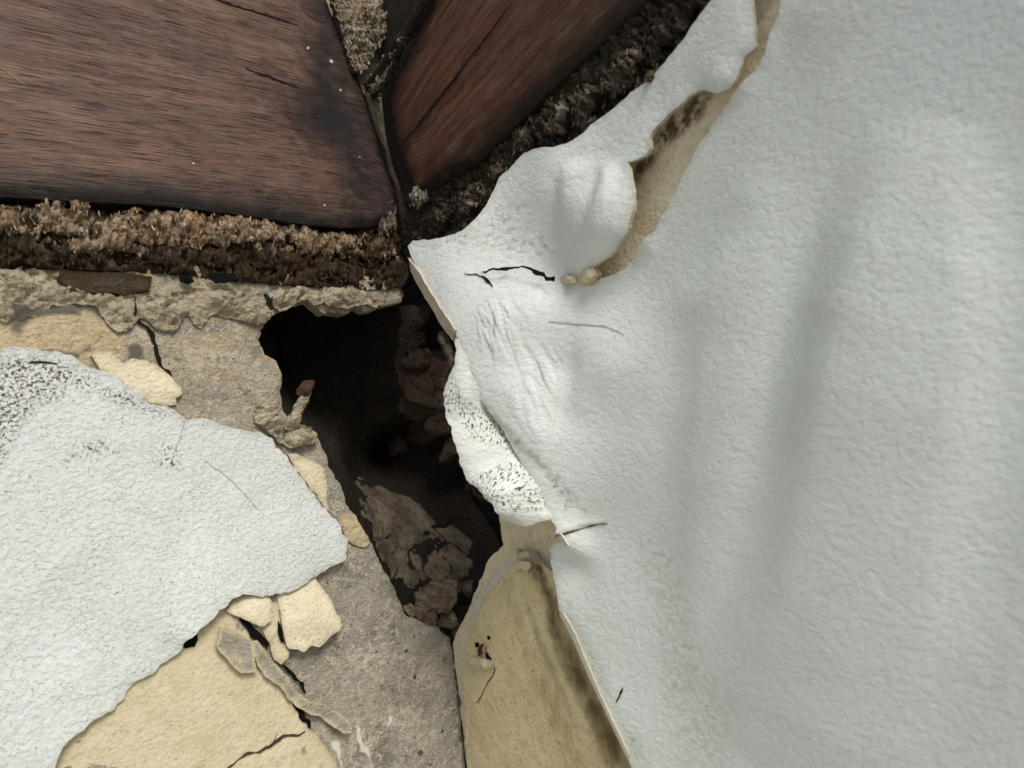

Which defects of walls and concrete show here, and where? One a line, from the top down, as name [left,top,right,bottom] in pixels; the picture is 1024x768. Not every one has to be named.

damp [660,98,707,143]
damp [634,156,654,179]
crack [464,266,555,287]
mould [438,368,510,450]
peeling [258,0,1024,768]
mould [469,460,544,510]
peeling [0,346,352,768]
crack [228,731,305,768]